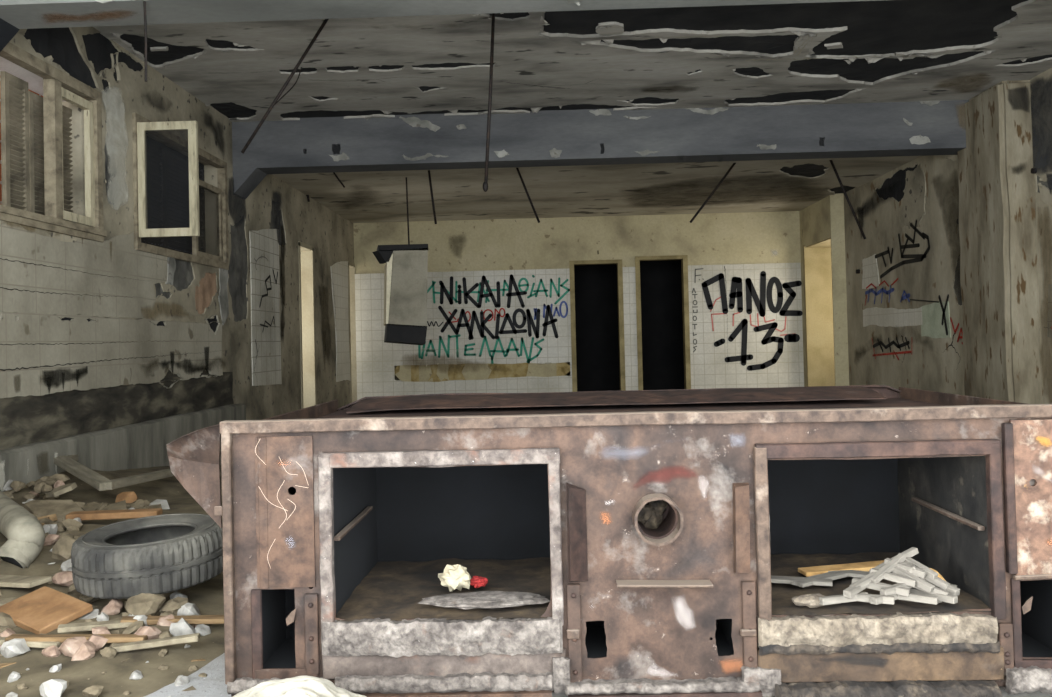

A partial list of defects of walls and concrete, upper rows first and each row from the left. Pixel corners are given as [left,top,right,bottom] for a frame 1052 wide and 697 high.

spalling [19,27,255,94]
spalling [280,0,1028,132]
spalling [1003,54,1052,65]
spalling [205,102,257,118]
spalling [875,162,918,202]
damp [44,367,87,391]